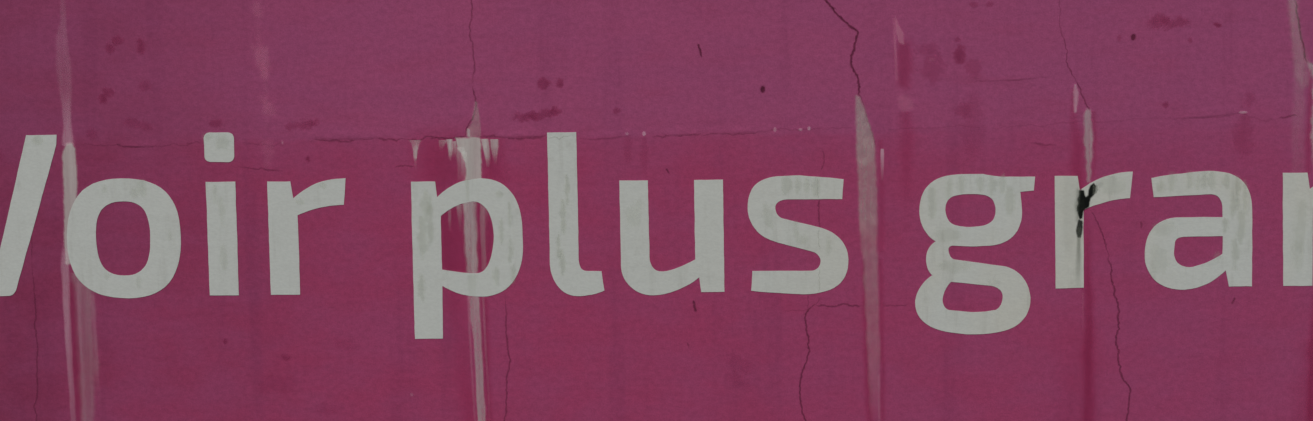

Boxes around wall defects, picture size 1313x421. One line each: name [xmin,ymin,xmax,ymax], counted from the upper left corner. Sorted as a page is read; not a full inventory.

crack [825,0,860,94]
efflorescence [449,138,487,180]
crack [799,308,810,421]